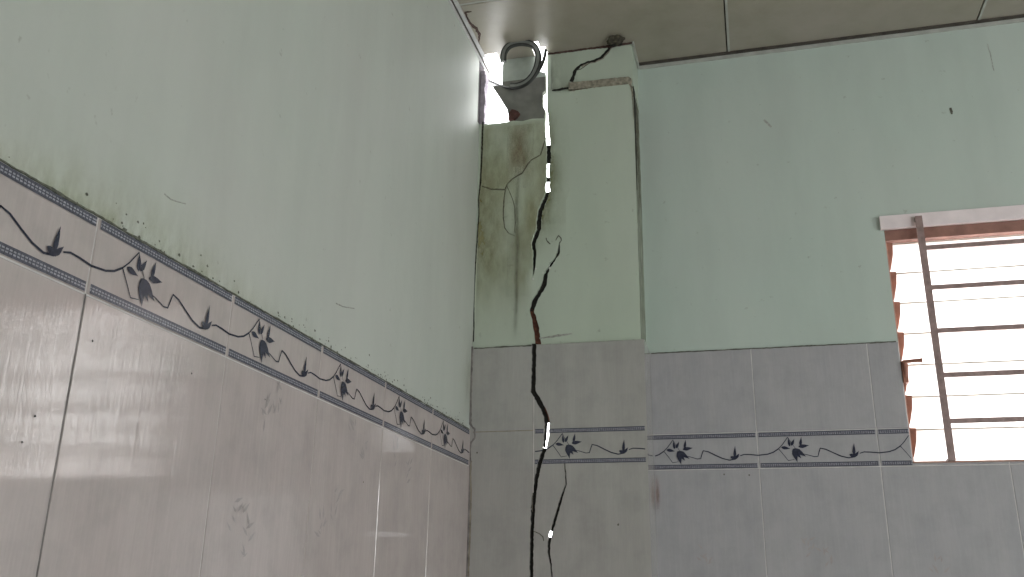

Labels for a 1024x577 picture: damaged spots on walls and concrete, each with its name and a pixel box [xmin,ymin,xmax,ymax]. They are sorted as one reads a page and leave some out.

water stain [0,157,470,430]
crack [466,117,572,577]
water stain [530,155,554,228]
crack [552,48,612,91]